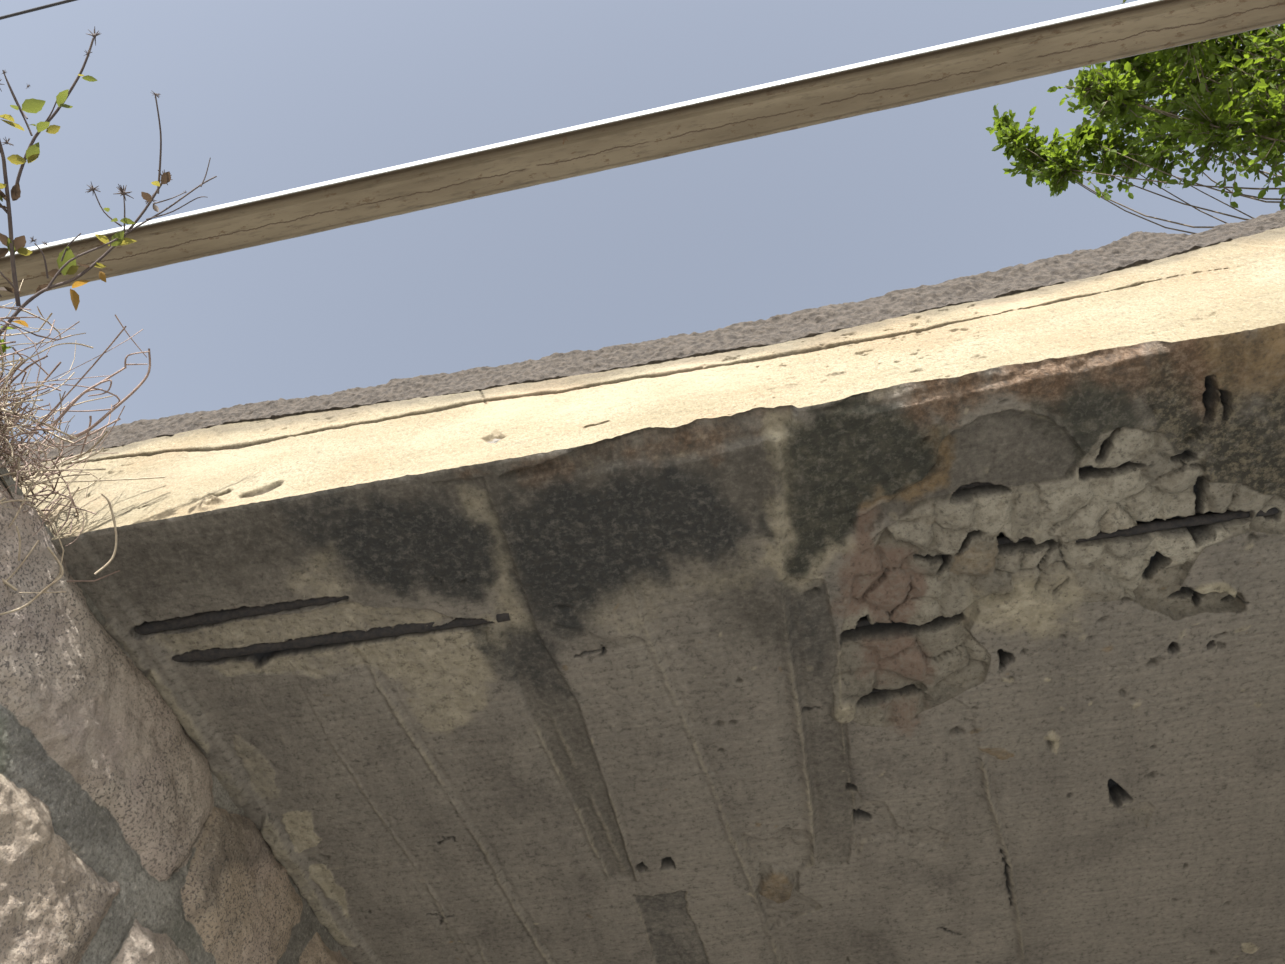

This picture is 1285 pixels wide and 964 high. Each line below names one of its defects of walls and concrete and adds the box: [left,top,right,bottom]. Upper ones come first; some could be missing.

leakage [52,411,866,746]
spalling [829,409,1285,730]
spalling [144,601,492,754]
hole [1106,778,1135,811]
peeling [630,890,711,964]
crack [1000,849,1015,908]